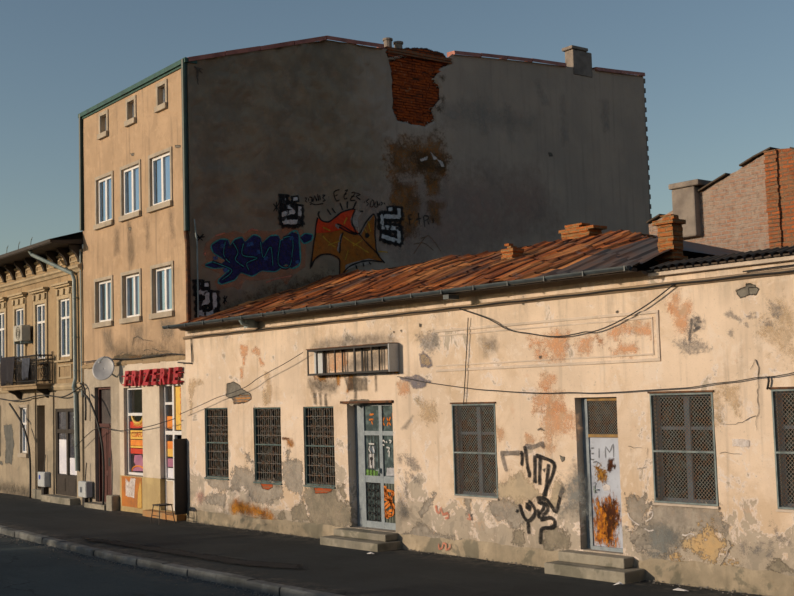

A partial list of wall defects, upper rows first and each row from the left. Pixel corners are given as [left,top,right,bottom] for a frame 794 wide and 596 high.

flaking render [386,47,447,126]
flaking render [204,437,352,527]
flaking render [402,492,462,541]
flaking render [489,469,565,547]
flaking render [542,525,572,551]
rust [594,459,616,486]
rust [592,496,622,548]
flaking render [624,493,745,568]
peeling [767,554,794,573]